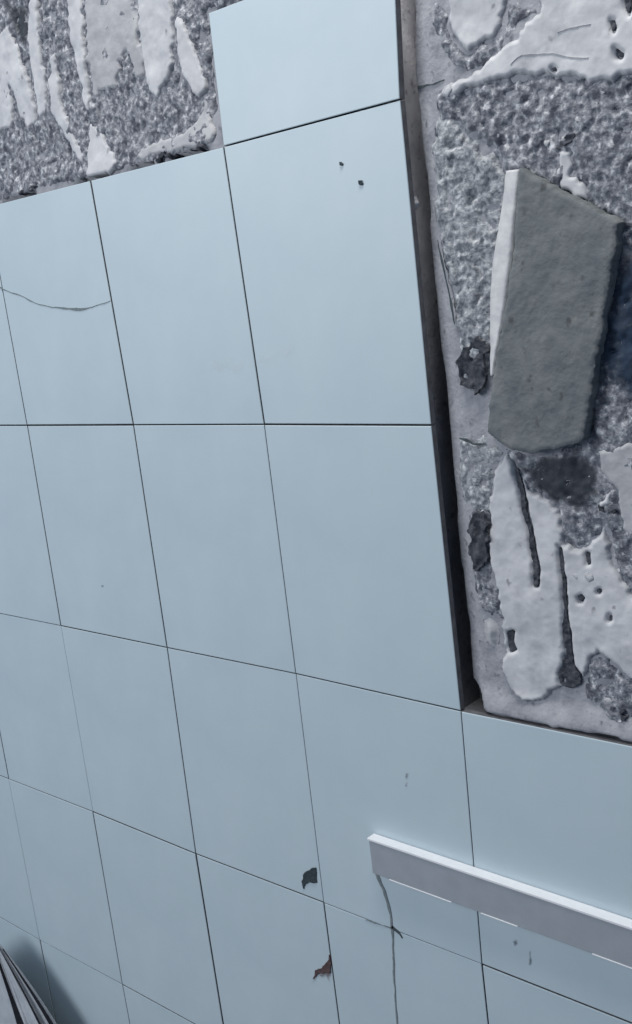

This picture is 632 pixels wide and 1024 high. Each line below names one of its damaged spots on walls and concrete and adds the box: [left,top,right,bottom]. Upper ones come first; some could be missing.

spalling [0,0,243,200]
spalling [432,0,632,395]
crack [0,287,110,311]
flaking render [458,342,632,723]
peeling [301,867,317,889]
rust [313,955,332,979]
crack [366,874,403,1024]